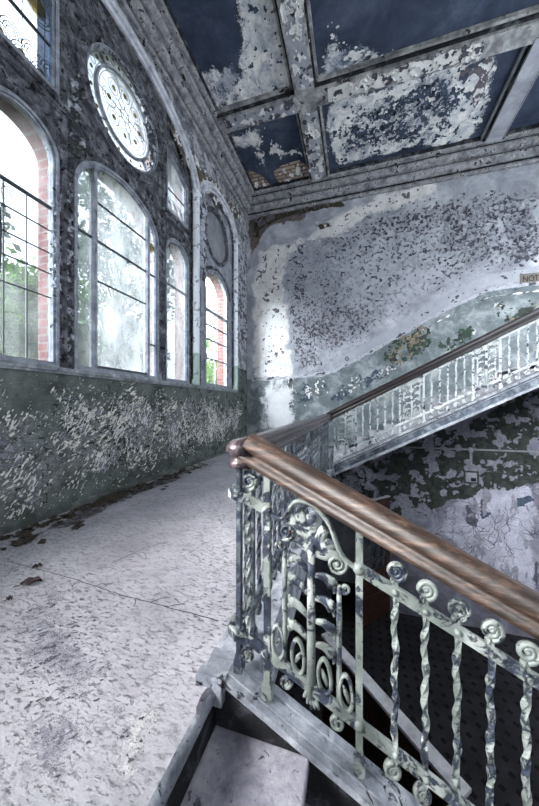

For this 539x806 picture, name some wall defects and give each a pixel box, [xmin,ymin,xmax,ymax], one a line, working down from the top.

peeling [224,0,325,188]
peeling [324,43,494,108]
peeling [166,120,344,343]
peeling [251,185,539,407]
peeling [0,381,243,520]
peeling [332,390,539,527]
crack [9,564,218,621]